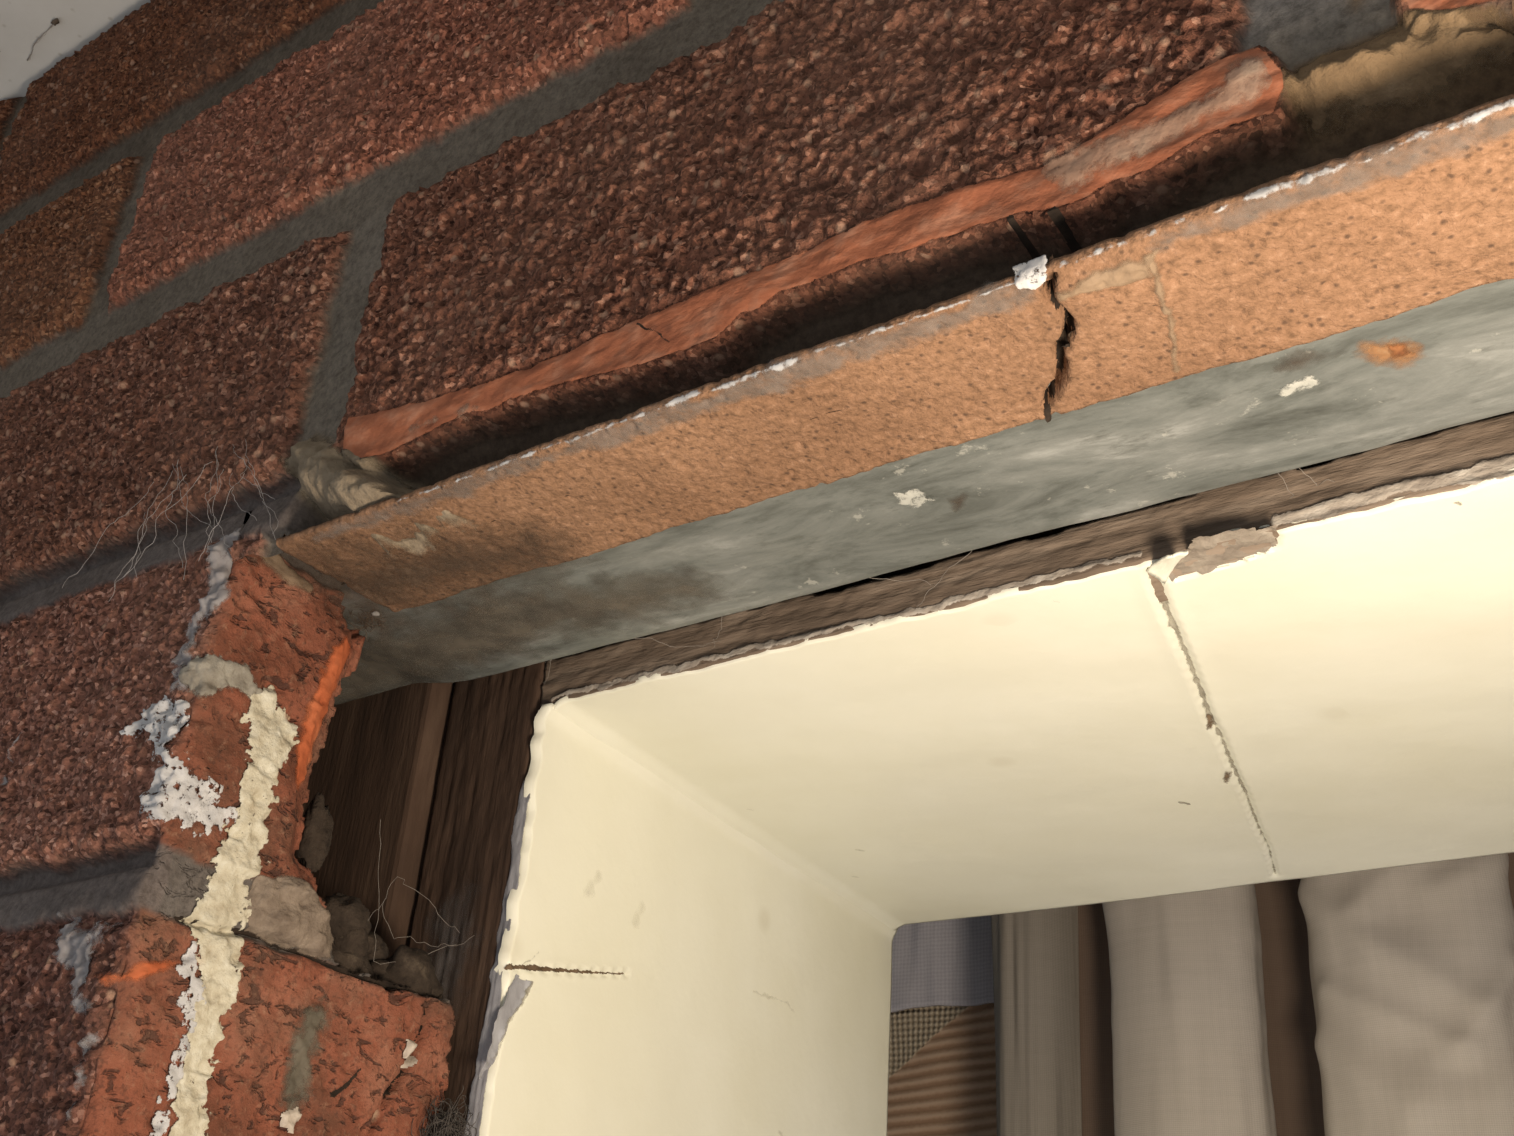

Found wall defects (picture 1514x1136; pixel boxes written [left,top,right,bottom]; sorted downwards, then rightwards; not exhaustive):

crack [1007,206,1082,423]
peeling [551,455,1514,702]
spalling [296,638,350,788]
crack [1149,576,1276,872]
crack [504,963,624,975]